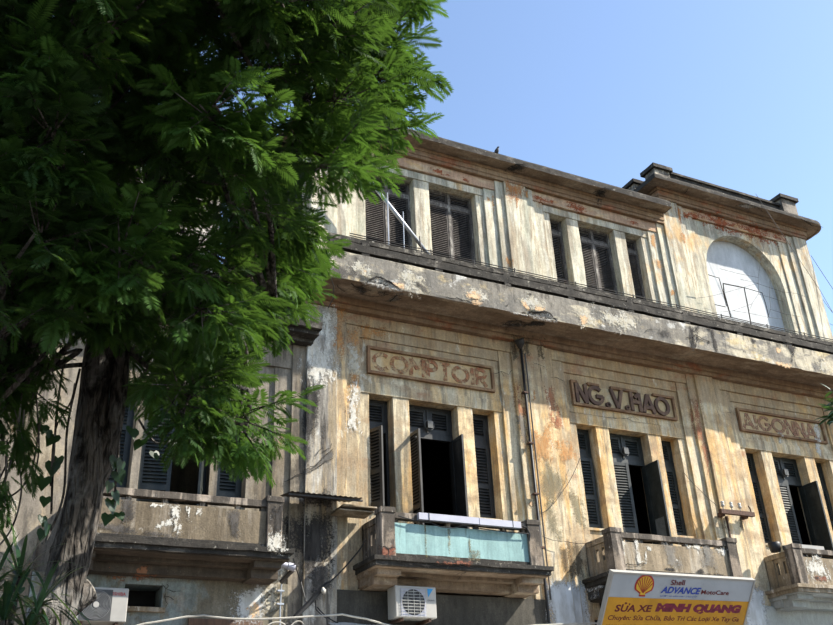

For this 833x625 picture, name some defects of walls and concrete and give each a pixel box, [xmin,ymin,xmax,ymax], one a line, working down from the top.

rust [505,180,553,208]
rust [674,204,791,248]
peeling [462,287,487,305]
peeling [500,291,557,330]
peeling [297,304,386,434]
peeling [150,503,202,534]
peeling [267,532,288,554]
leakage [270,489,335,595]